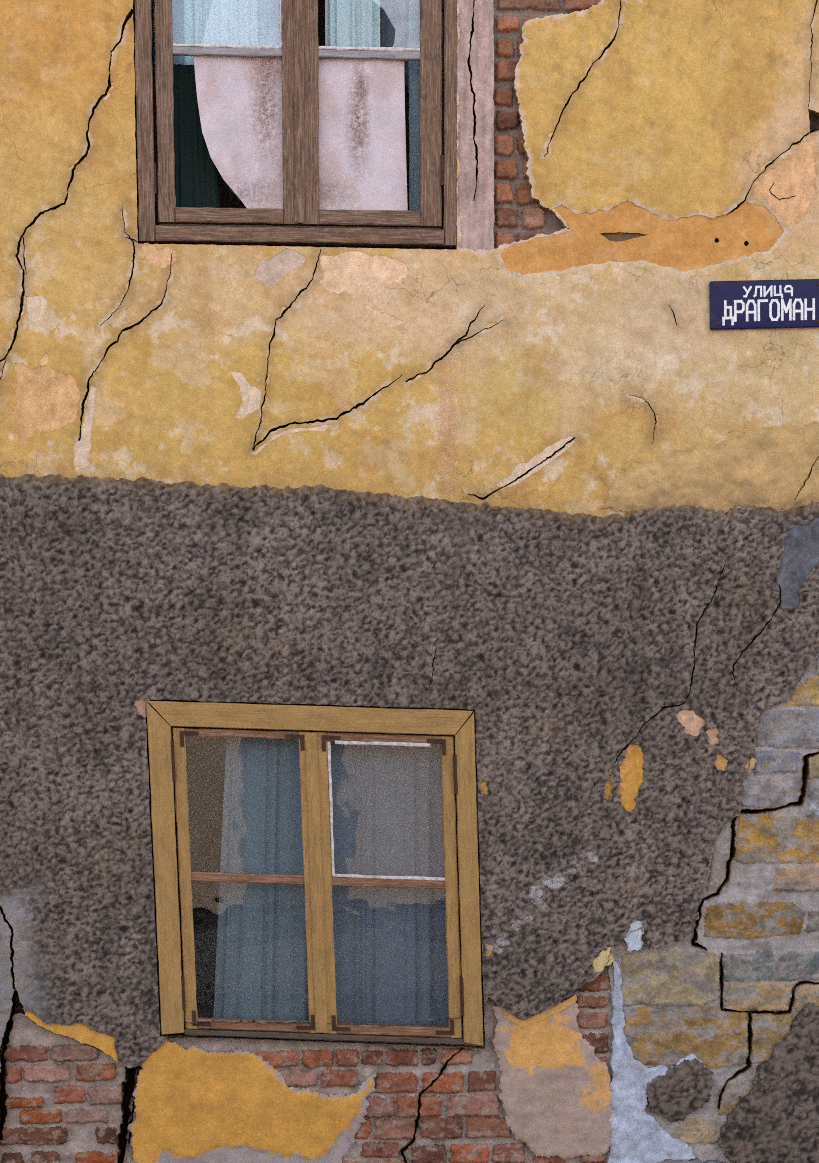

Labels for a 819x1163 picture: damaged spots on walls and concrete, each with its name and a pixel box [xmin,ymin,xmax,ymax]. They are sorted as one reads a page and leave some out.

crack [0,10,134,380]
crack [467,0,478,201]
flaking render [455,0,819,275]
crack [727,0,818,215]
crack [73,209,174,470]
crack [229,250,502,456]
crack [0,906,17,1138]
flaking render [0,1013,143,1163]
crack [117,1065,140,1163]
flaking render [167,999,611,1163]
flaking render [560,653,819,1163]
crack [691,752,819,1109]